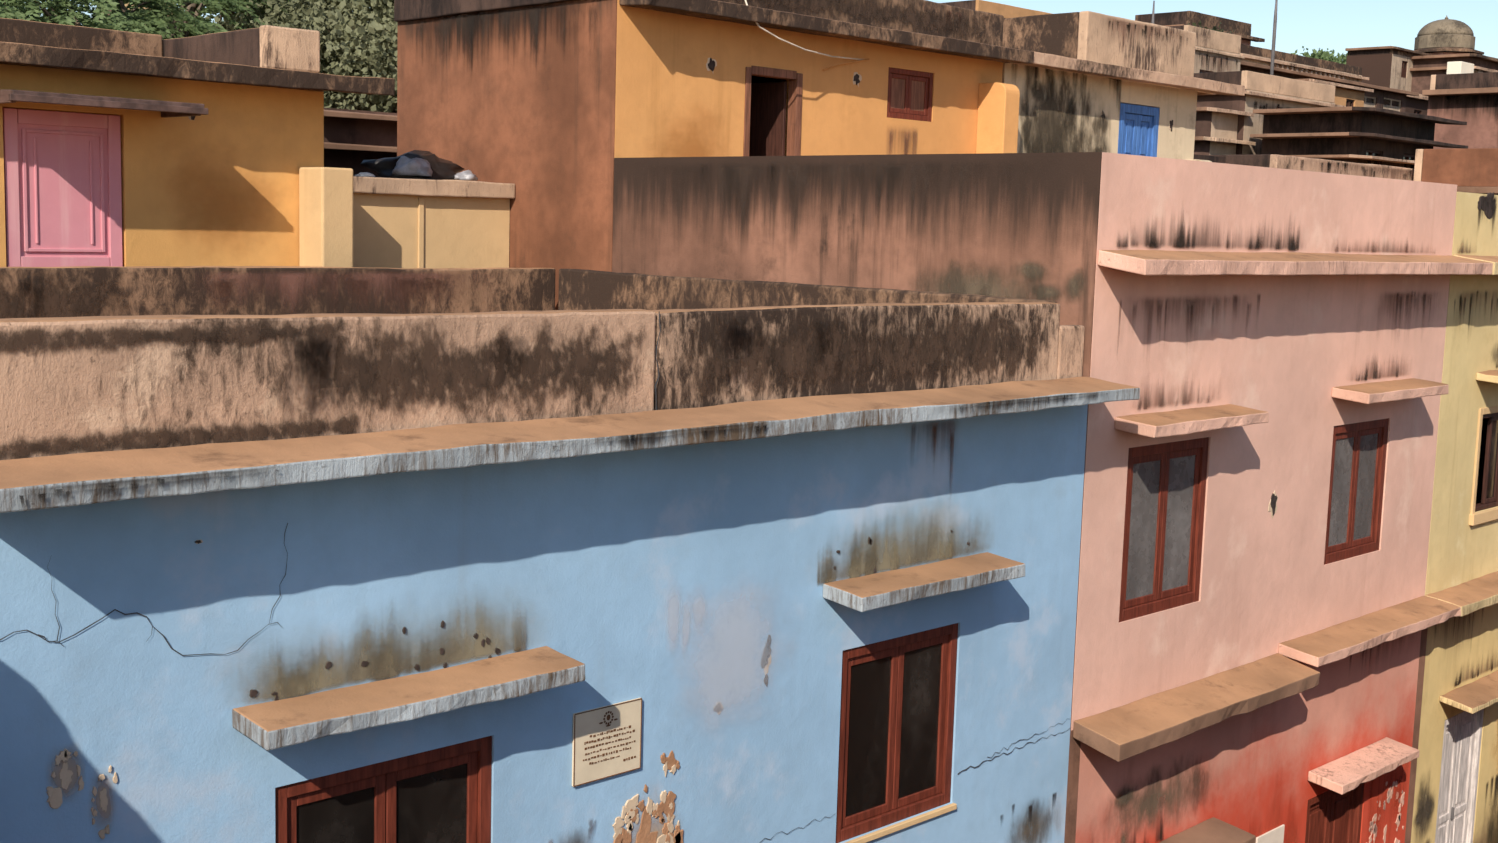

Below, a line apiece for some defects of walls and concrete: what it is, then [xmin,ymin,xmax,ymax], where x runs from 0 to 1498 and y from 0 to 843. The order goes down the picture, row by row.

damp [765,0,987,40]
damp [1022,66,1108,153]
damp [1118,231,1229,248]
damp [1249,239,1299,250]
damp [0,274,642,459]
damp [602,424,767,445]
crack [0,523,288,656]
damp [818,526,976,584]
damp [249,620,526,701]
peeling [46,749,118,839]
peeling [612,751,683,843]
peeling [1366,781,1405,843]